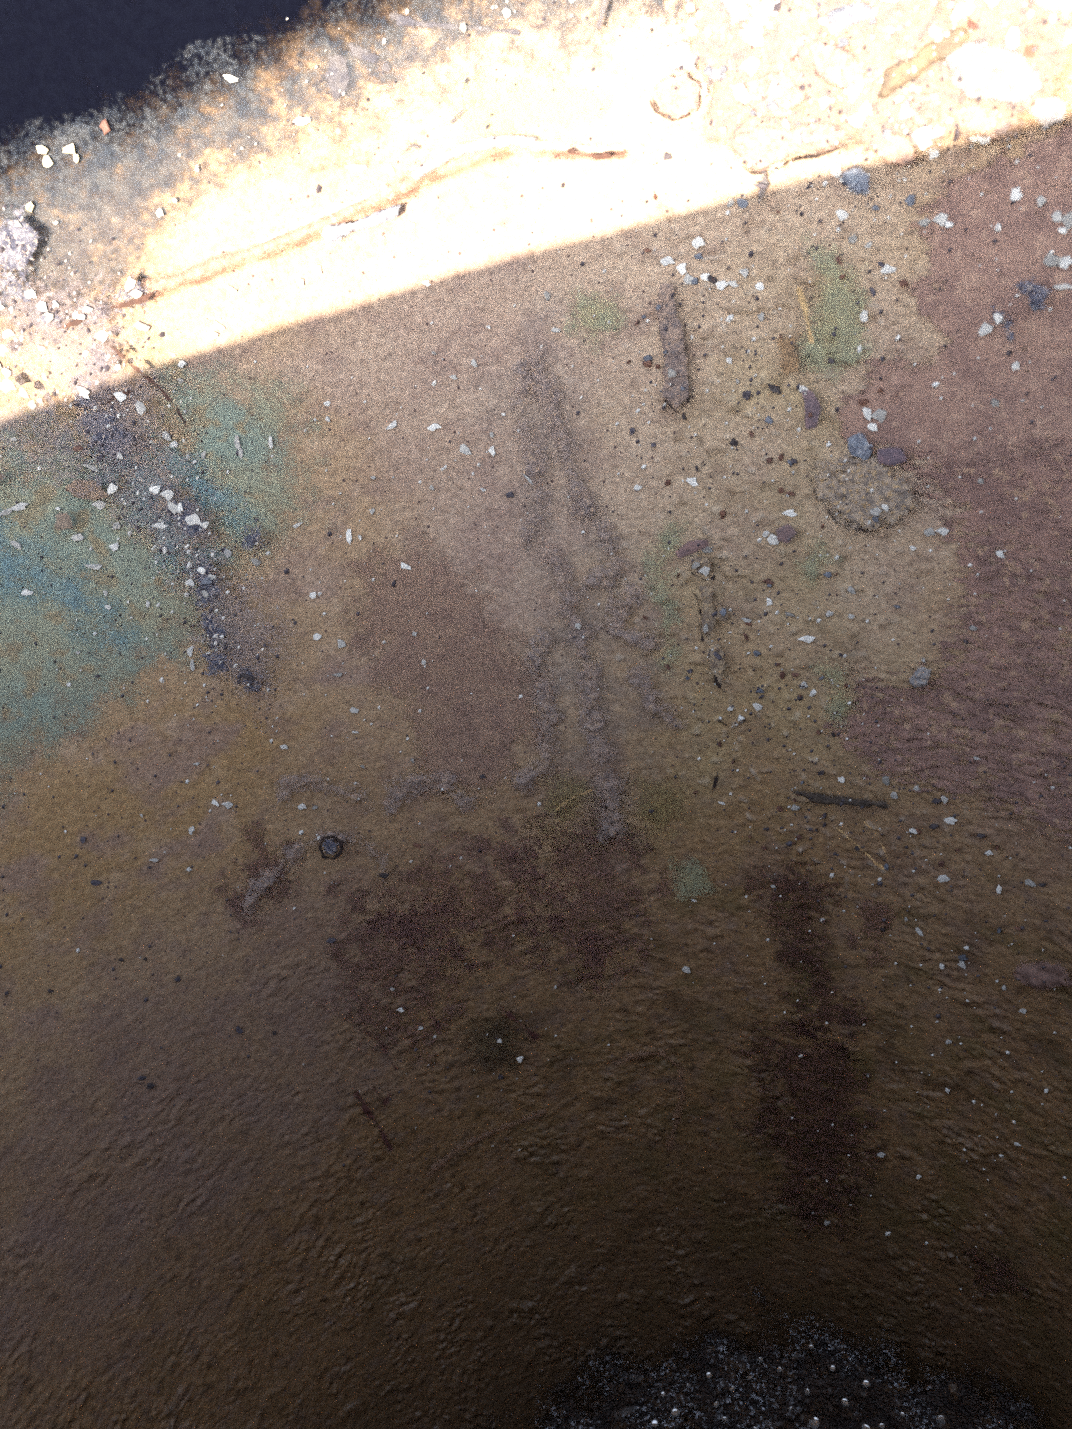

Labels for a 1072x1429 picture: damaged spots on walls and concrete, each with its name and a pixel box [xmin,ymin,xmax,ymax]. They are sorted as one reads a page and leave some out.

rust [627,283,691,420]
rust [649,0,1072,1240]